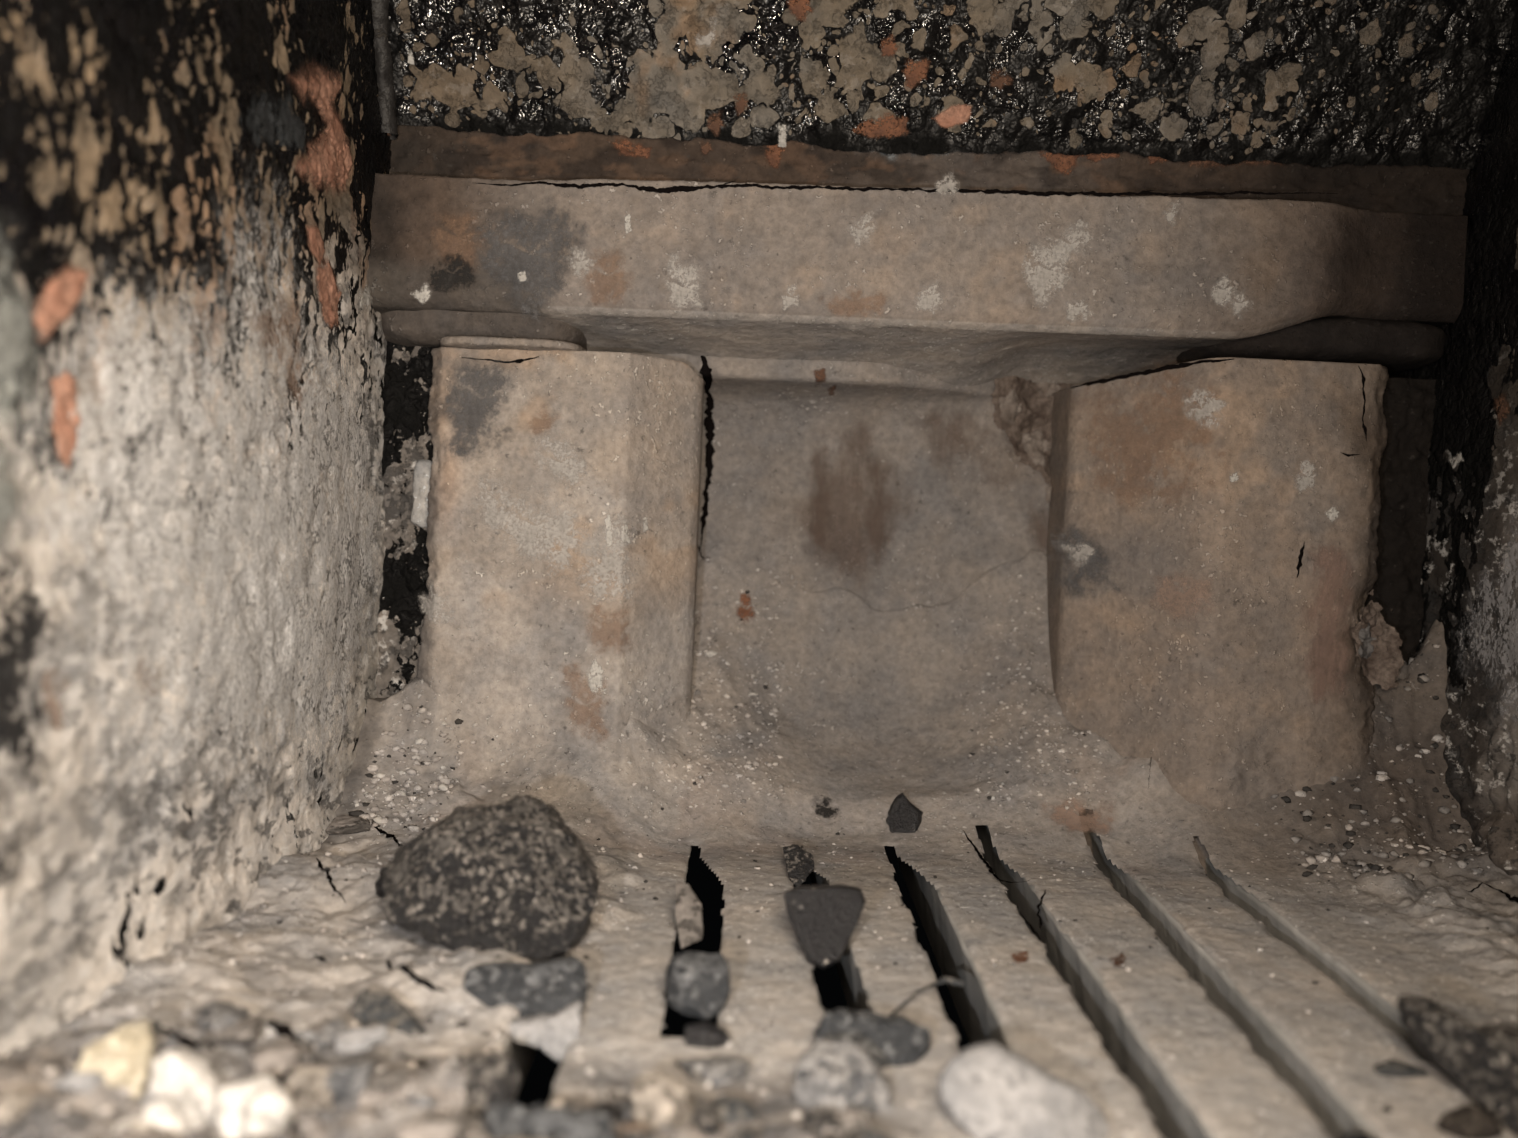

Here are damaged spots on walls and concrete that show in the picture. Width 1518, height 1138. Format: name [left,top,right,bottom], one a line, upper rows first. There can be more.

corrosion [295,73,352,188]
crack [478,181,1338,197]
spalling [0,263,38,435]
corrosion [35,265,87,335]
corrosion [307,227,341,328]
corrosion [51,371,81,468]
crack [698,355,715,559]